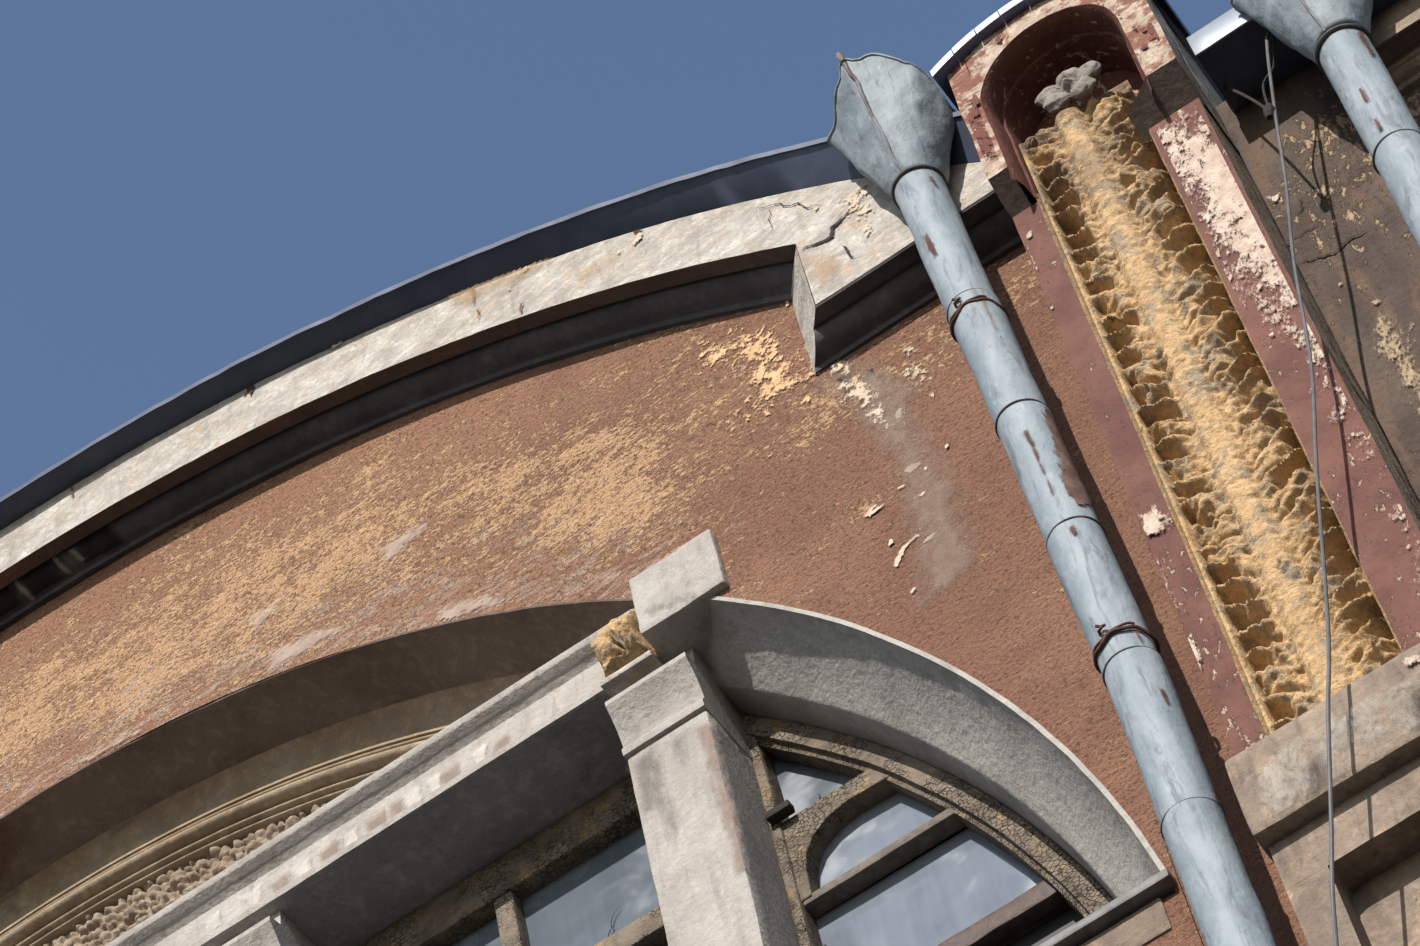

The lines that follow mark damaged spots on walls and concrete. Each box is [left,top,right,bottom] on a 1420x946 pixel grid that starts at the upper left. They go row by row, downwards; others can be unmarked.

spalling [1095,0,1204,90]
peeling [965,77,996,158]
crack [758,184,869,257]
peeling [683,301,905,438]
peeling [902,347,934,398]
peeling [1157,110,1420,551]